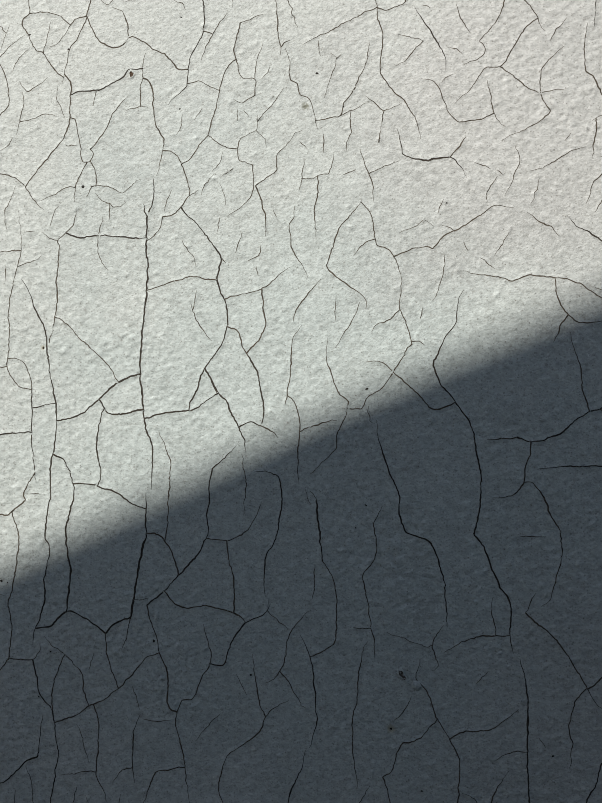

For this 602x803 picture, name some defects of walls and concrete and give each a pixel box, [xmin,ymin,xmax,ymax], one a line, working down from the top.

crack [273,0,569,236]
crack [526,0,602,238]
crack [566,214,602,245]
crack [0,0,310,803]
crack [282,127,548,803]
crack [464,232,602,769]
crack [582,761,602,803]